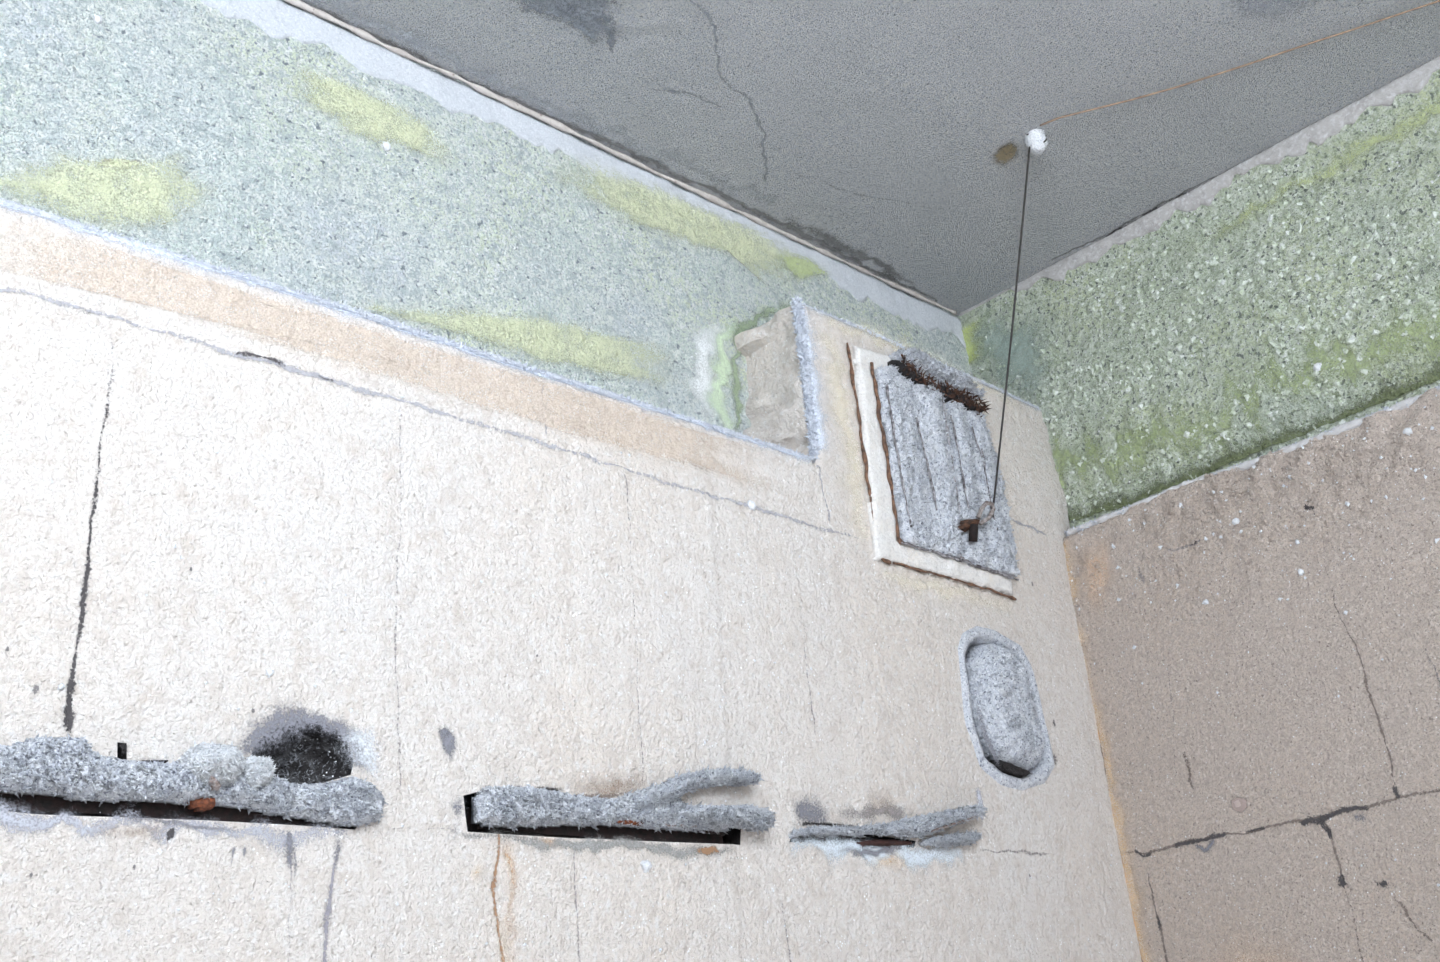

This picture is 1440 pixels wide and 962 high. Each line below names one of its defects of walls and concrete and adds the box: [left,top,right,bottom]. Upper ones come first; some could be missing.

water stain [301,0,937,301]
crack [663,0,768,181]
crack [0,287,859,785]
rust [837,329,1019,601]
water stain [977,322,1043,388]
water stain [1053,315,1440,488]
crack [1125,559,1440,962]
rust [491,834,505,962]